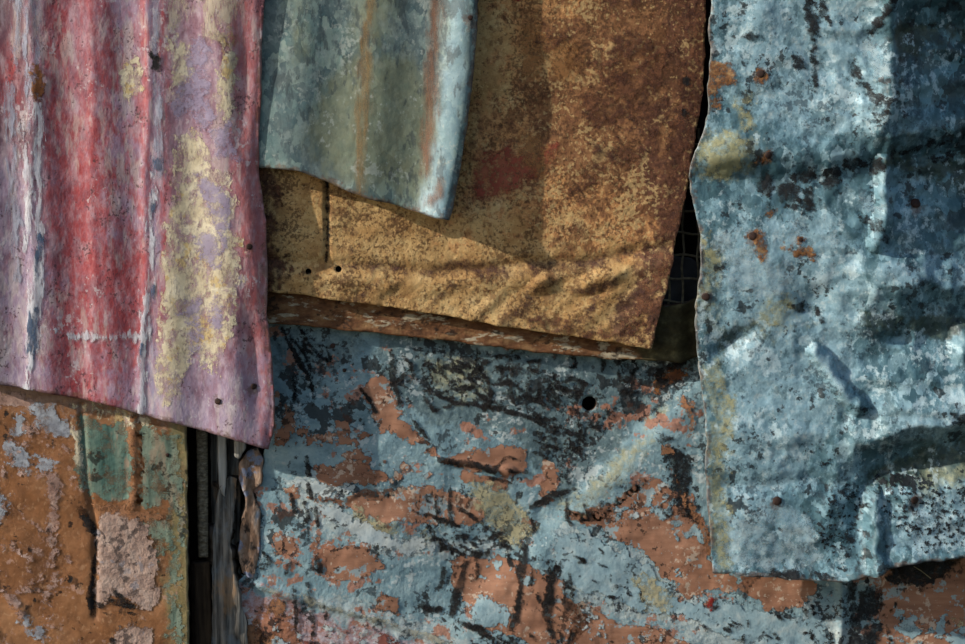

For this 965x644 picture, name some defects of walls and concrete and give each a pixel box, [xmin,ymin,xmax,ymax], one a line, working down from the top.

rust [259,0,737,395]
rust [746,229,768,263]
rust [780,235,816,262]
peeling [786,300,824,324]
spalling [0,391,188,644]
spalling [236,446,297,579]
peeling [247,587,445,644]
peeling [273,376,559,583]
peeling [449,468,835,644]
peeling [677,395,696,438]
peeling [803,467,965,644]